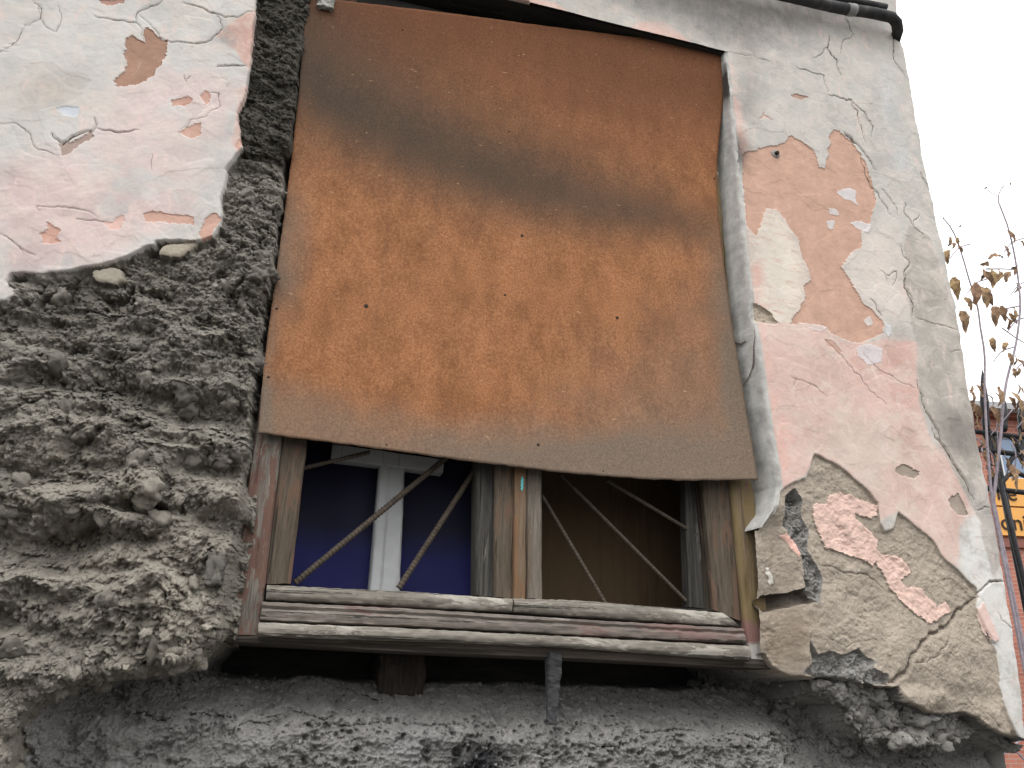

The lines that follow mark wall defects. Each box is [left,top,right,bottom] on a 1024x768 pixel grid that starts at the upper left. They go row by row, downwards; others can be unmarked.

crack [0,3,62,52]
crack [98,1,253,44]
peeling [742,129,893,365]
crack [824,17,962,352]
spalling [0,0,311,768]
crack [831,345,991,510]
spalling [747,454,1023,753]
crack [882,581,998,685]